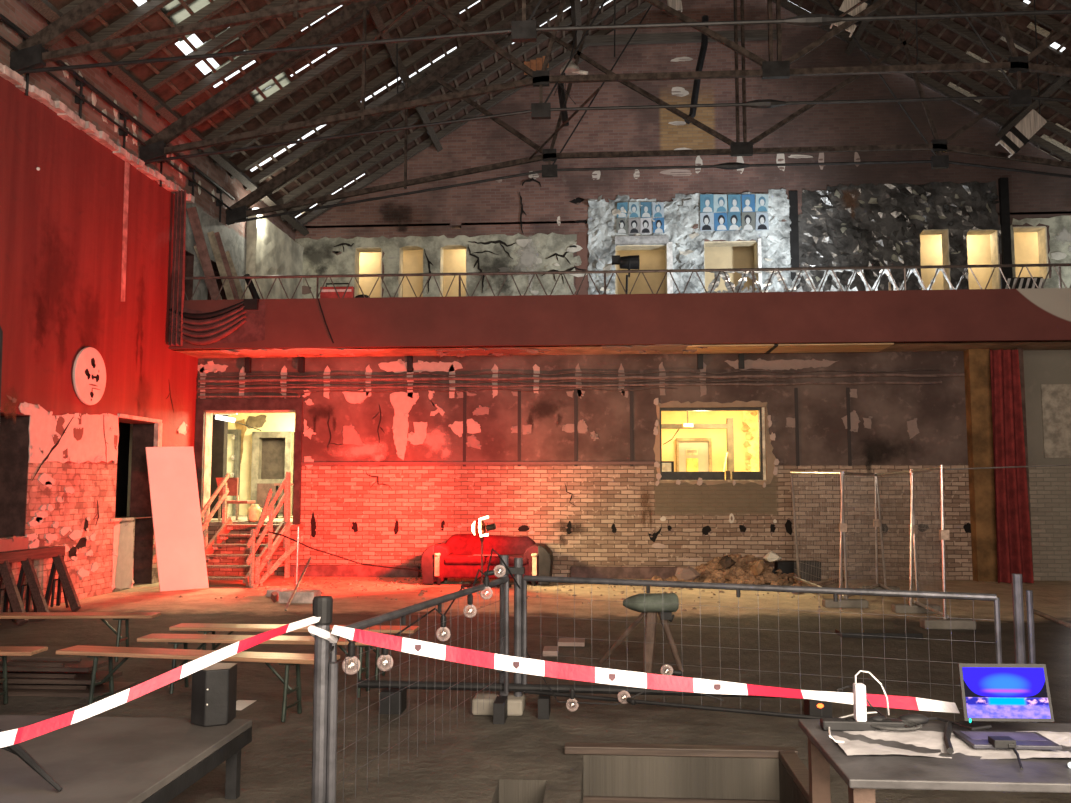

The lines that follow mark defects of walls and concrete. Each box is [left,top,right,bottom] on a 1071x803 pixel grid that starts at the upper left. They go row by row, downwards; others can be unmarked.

crack [468,178,541,293]
crack [541,251,586,283]
peeling [342,390,369,404]
crack [32,418,73,480]
flaking render [6,395,119,464]
peeling [303,419,316,439]
peeling [342,424,365,446]
peeling [390,390,489,460]
peeling [511,425,532,435]
peeling [562,419,599,441]
flaking render [653,398,779,488]
spalling [69,517,93,568]